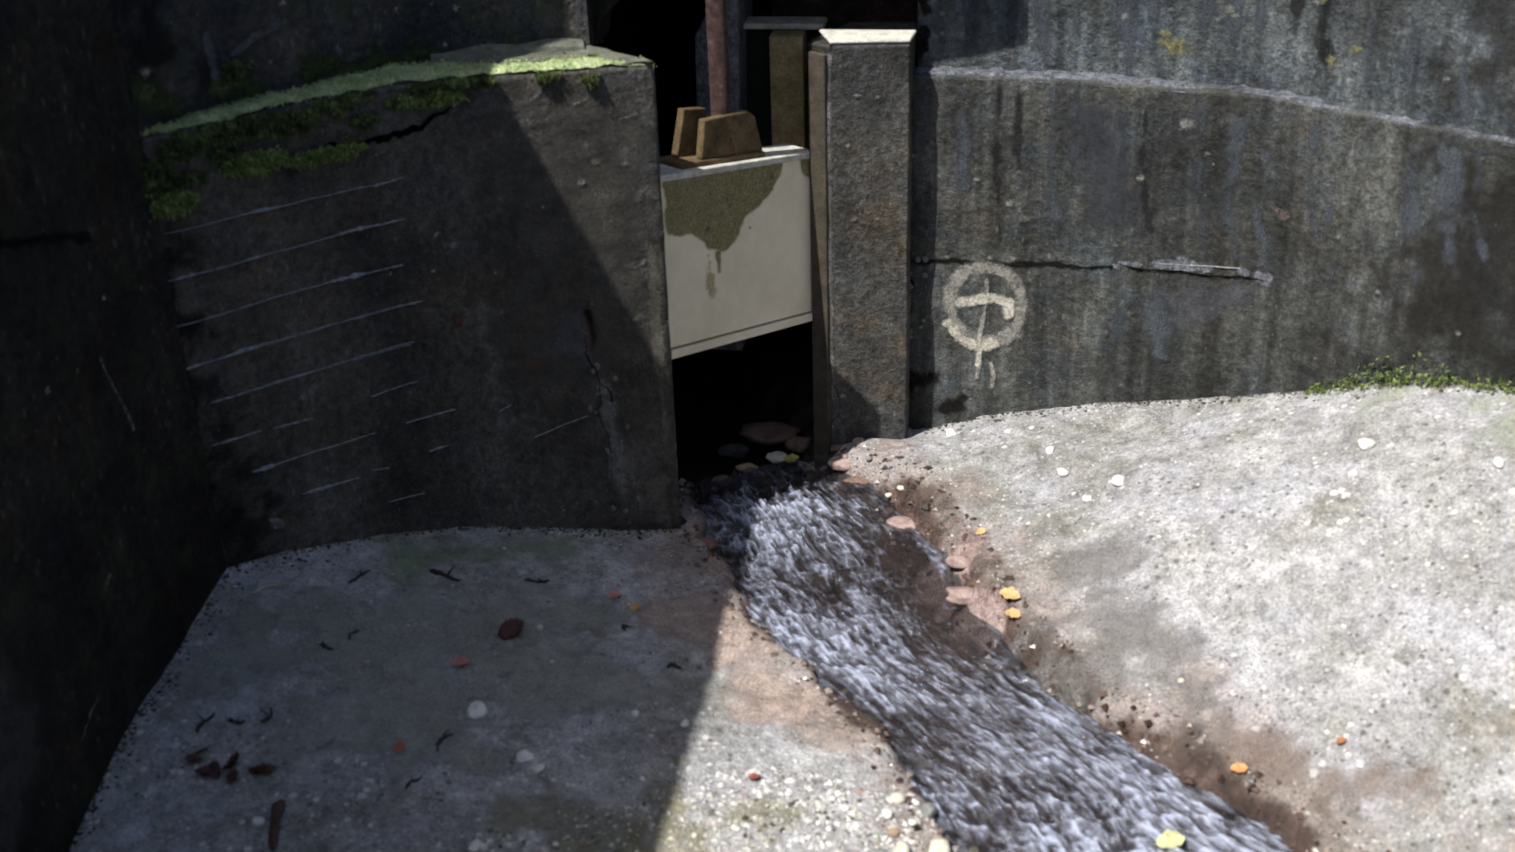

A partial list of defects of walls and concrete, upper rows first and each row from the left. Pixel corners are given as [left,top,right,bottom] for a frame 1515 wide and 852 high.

crack [303,107,454,157]
crack [0,231,92,249]
crack [911,251,1265,281]